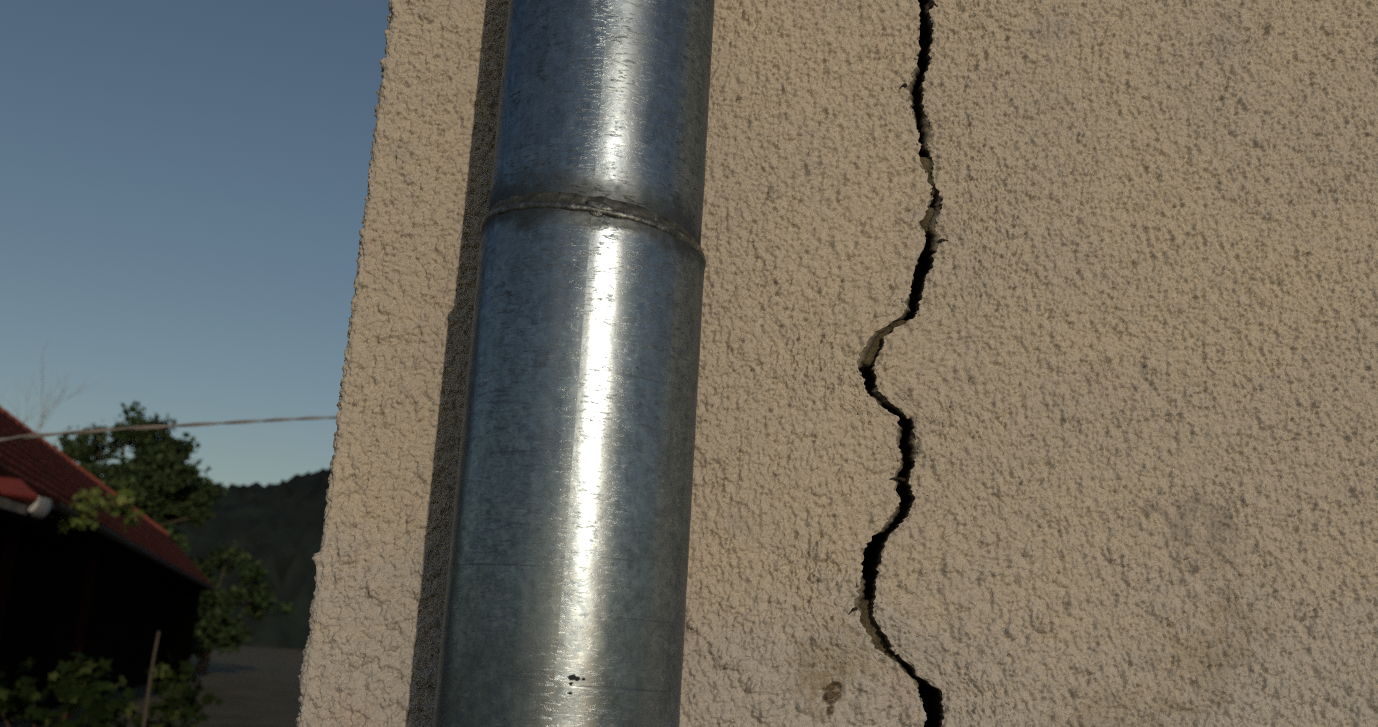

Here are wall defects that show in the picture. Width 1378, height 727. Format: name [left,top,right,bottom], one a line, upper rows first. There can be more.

crack [849,0,948,727]